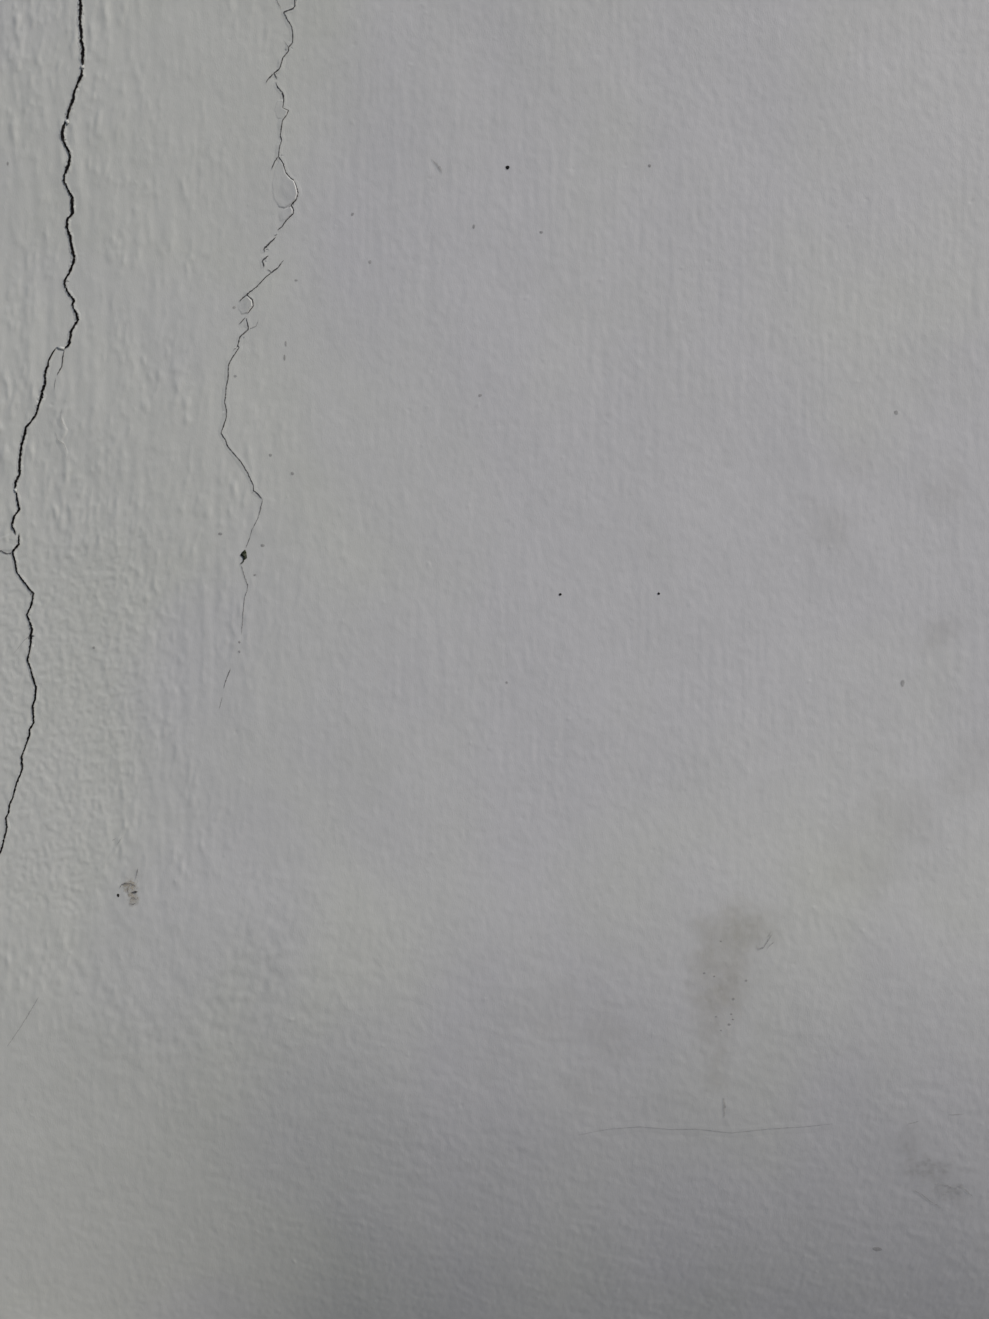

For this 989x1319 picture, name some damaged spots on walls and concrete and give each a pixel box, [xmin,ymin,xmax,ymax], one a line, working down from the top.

crack [0,0,87,869]
crack [218,0,302,634]